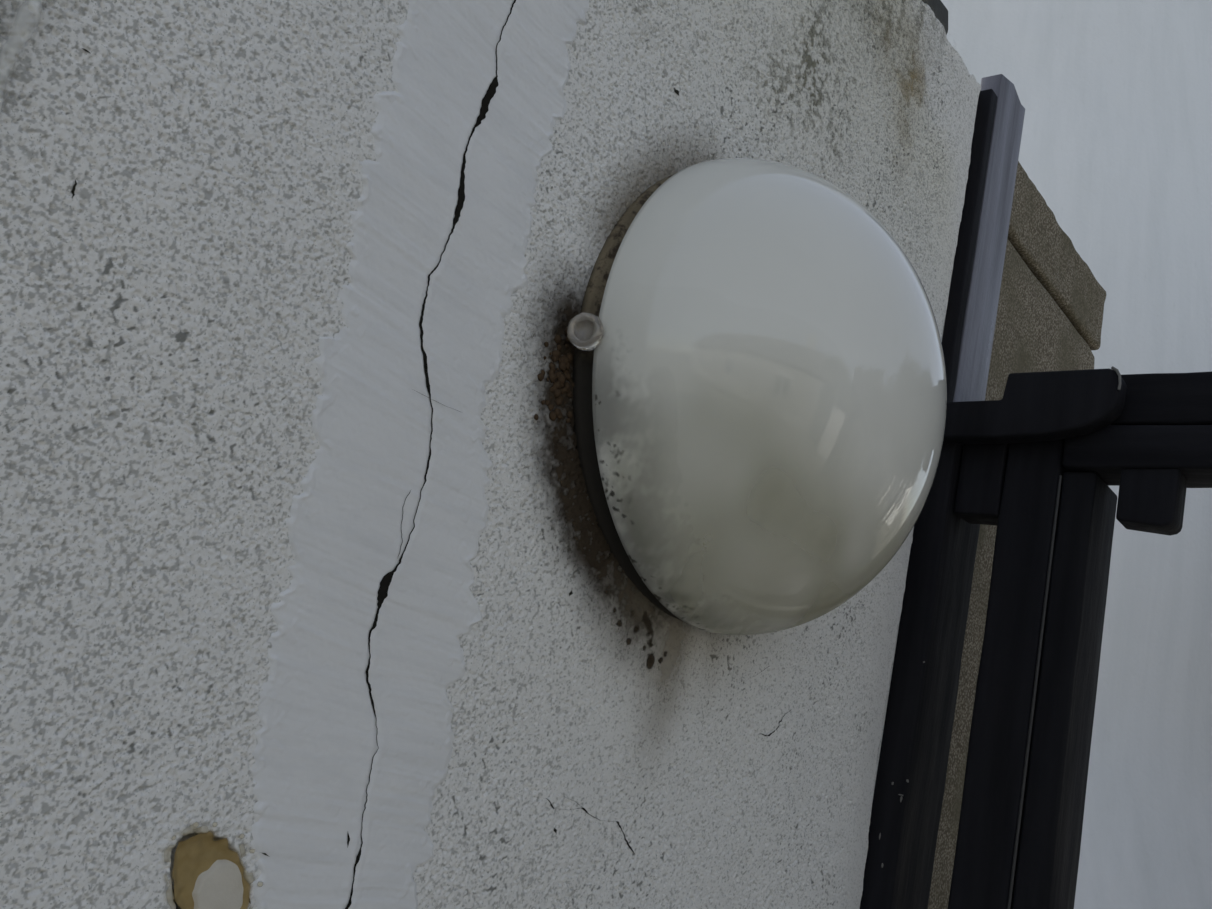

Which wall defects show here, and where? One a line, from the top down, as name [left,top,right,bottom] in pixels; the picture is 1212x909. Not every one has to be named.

crack [345,0,516,909]
crack [513,792,635,854]